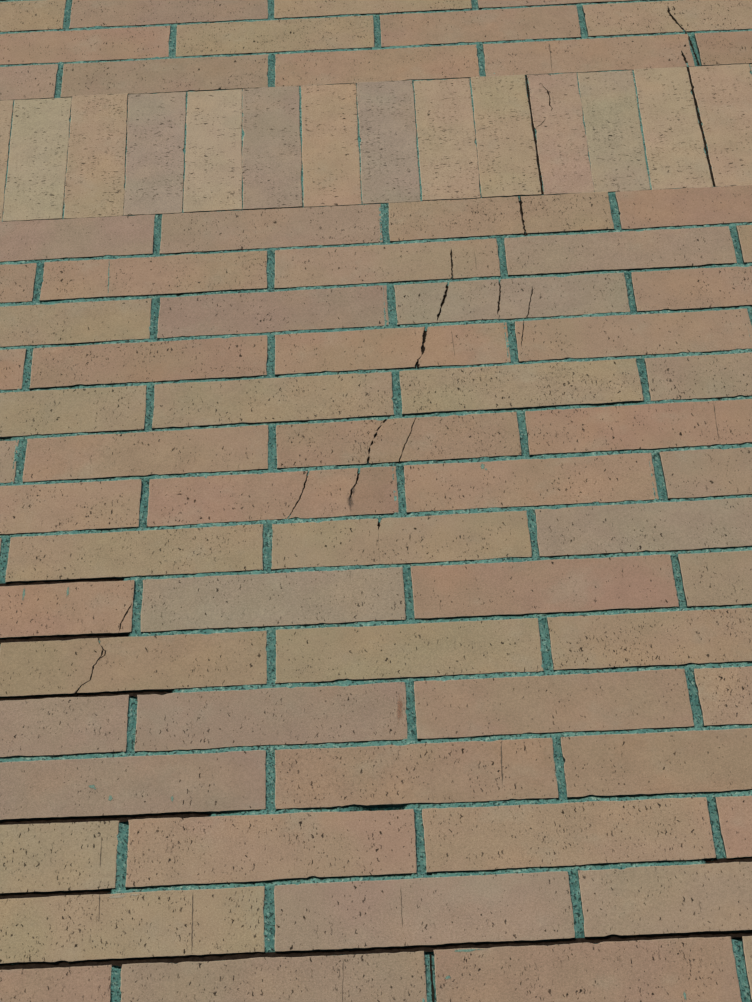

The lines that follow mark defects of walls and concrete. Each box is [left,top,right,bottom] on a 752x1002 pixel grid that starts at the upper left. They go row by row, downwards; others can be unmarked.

crack [667,6,715,187]
crack [414,250,477,368]
crack [349,419,387,499]
crack [74,604,132,696]